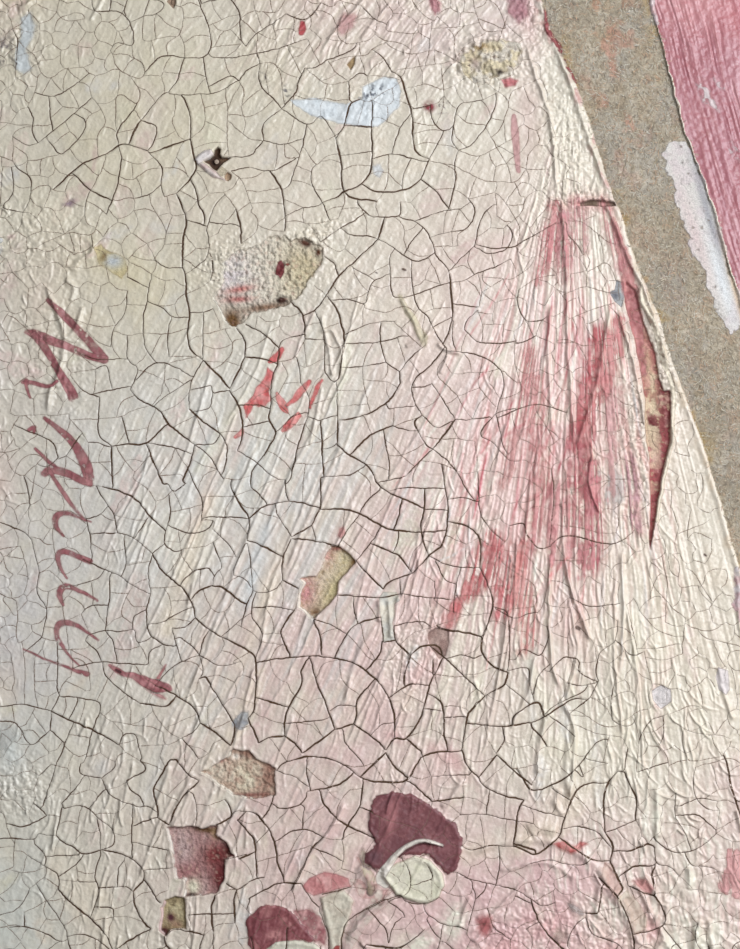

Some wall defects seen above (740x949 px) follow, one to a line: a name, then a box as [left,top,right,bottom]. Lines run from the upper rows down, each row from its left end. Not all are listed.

crack [92,0,149,46]
crack [12,73,90,174]
crack [110,0,357,229]
crack [0,165,32,212]
peeling [213,235,323,327]
crack [15,425,81,467]
crack [54,55,681,949]
peeling [298,546,355,618]
peeling [200,749,276,799]
crack [654,781,716,866]
crack [686,755,740,814]
peeling [159,825,234,935]